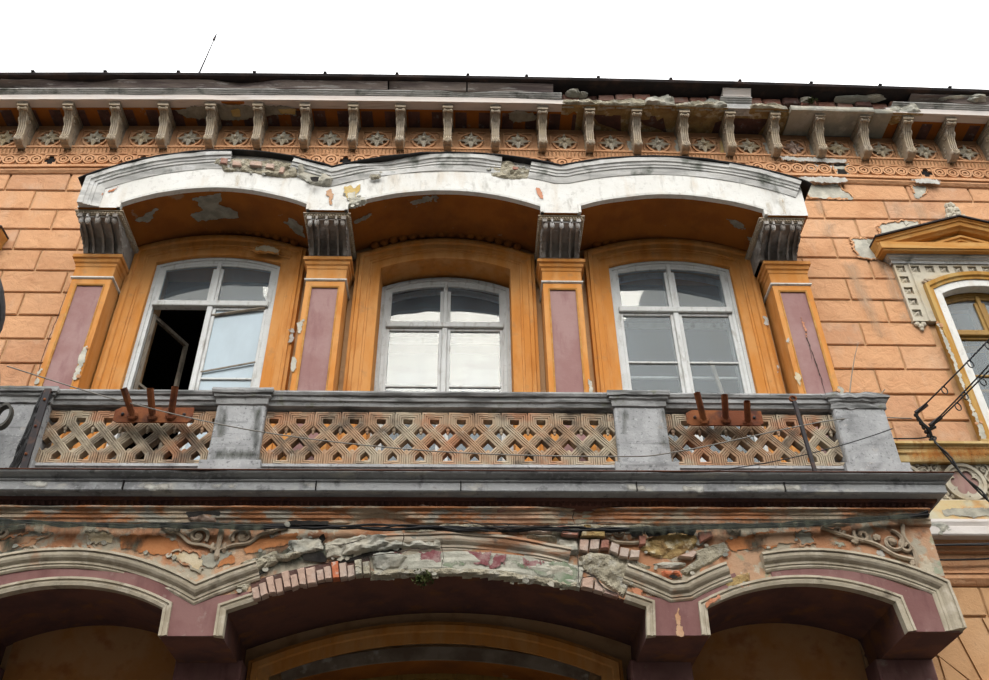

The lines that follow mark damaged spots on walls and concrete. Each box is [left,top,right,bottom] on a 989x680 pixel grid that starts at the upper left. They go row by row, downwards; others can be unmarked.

spalling [214,158,382,224]
spalling [487,161,530,180]
flaking render [763,142,859,201]
flaking render [849,219,919,261]
spalling [0,509,816,602]
spalling [705,573,750,608]